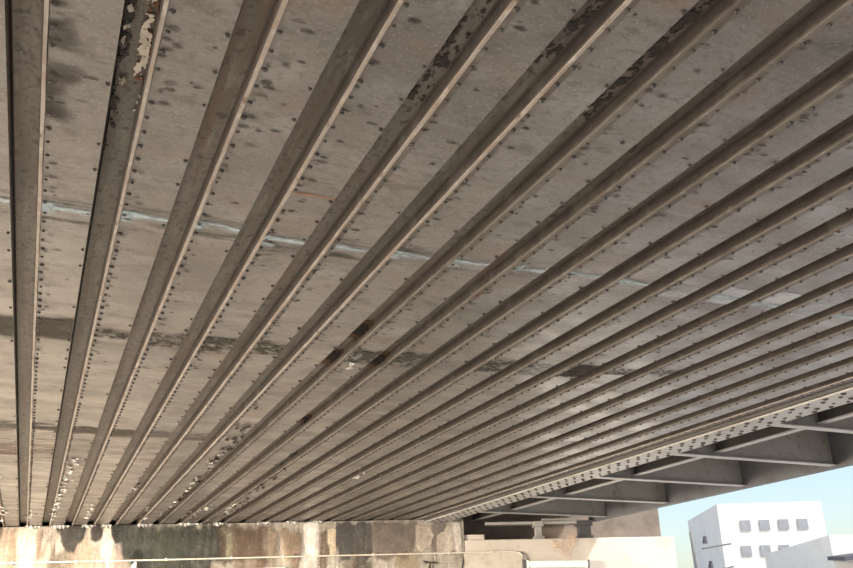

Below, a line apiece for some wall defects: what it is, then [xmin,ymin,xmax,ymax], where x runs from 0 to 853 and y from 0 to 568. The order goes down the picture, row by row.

peeling [109,0,157,129]
leakage [0,527,16,568]
leakage [25,522,238,568]
leakage [281,520,416,568]
leakage [432,522,446,557]